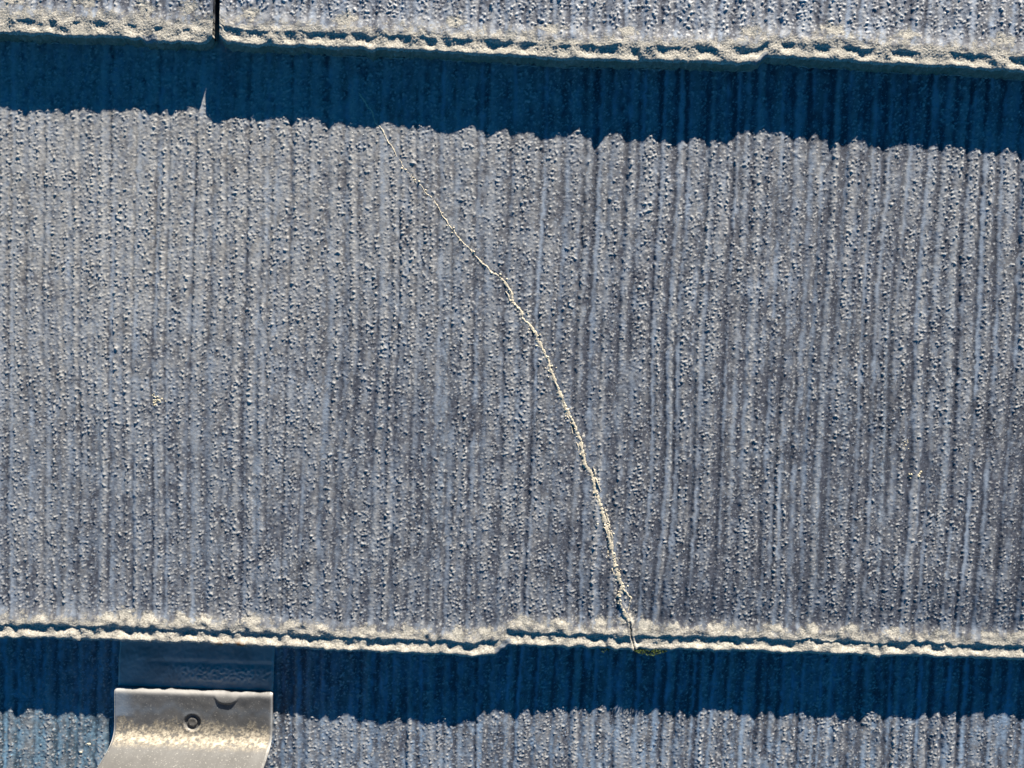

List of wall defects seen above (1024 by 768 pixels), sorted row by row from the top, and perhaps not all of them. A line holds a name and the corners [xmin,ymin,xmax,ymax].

crack [358,92,635,650]